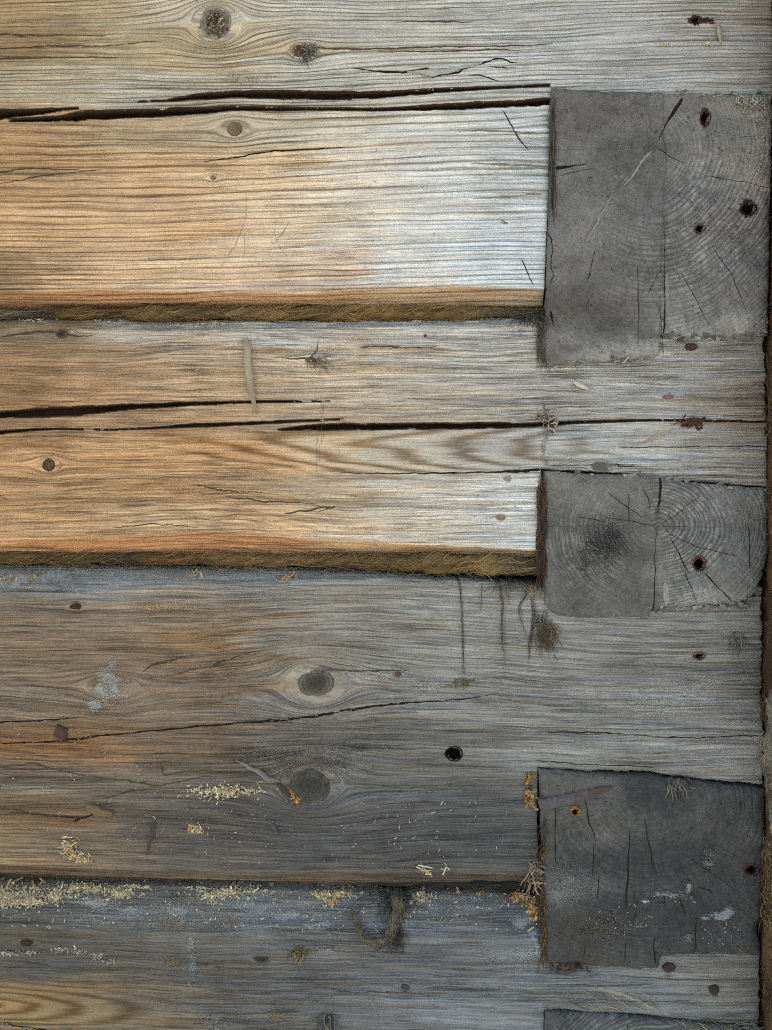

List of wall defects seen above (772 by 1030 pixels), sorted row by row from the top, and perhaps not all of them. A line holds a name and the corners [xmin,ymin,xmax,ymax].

crack [0,167,102,183]
crack [0,20,593,176]
crack [480,194,541,224]
crack [585,163,632,309]
crack [658,98,683,163]
crack [637,247,709,354]
corrosion [673,415,706,431]
crack [0,400,766,609]
crack [0,694,495,822]
crack [585,801,599,899]
crack [625,820,736,953]
crack [549,938,756,1030]